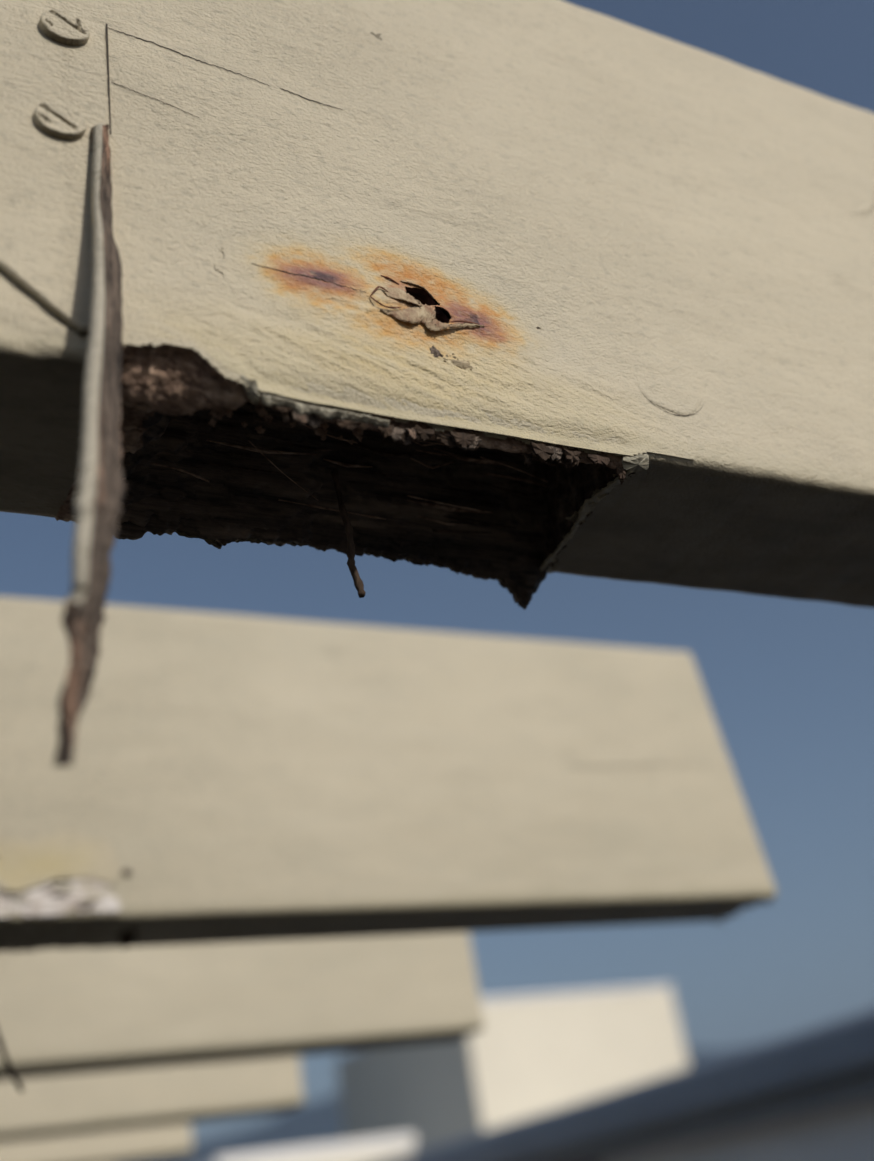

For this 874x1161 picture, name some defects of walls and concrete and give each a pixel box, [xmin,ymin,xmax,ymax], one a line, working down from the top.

corrosion [215,225,565,390]
peeling [241,376,390,428]
peeling [540,454,649,571]
peeling [0,876,121,917]